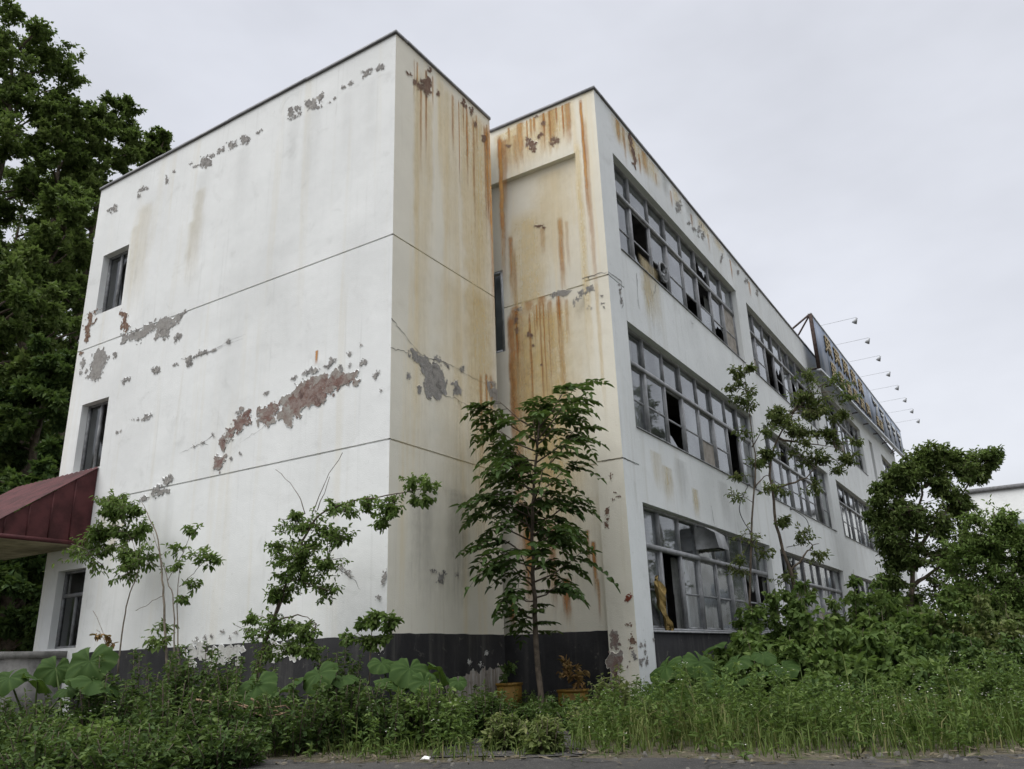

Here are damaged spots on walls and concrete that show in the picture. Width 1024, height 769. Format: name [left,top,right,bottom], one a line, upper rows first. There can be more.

peeling [287,63,385,120]
peeling [188,128,263,169]
flaking render [525,115,559,153]
corrosion [485,102,588,275]
peeling [550,284,605,310]
flaking render [79,308,187,382]
peeling [173,338,230,367]
flaking render [407,348,465,400]
corrosion [508,296,565,459]
peeling [192,344,382,474]
flaking render [605,622,655,689]